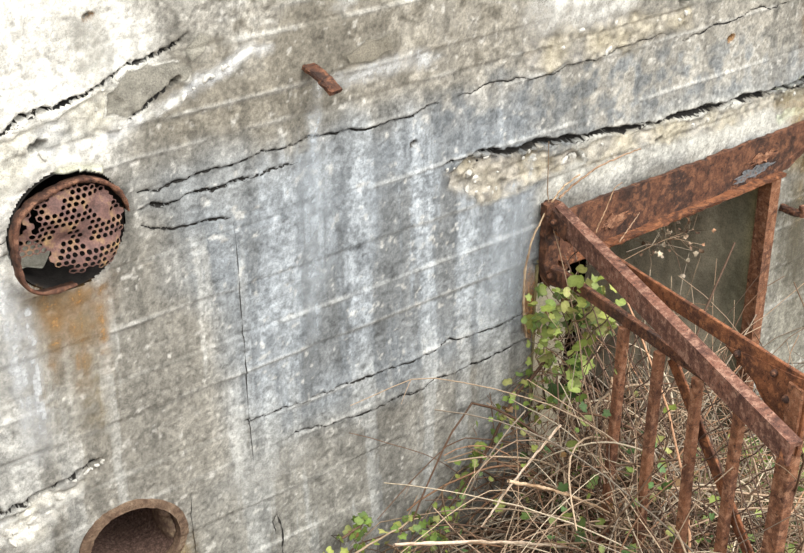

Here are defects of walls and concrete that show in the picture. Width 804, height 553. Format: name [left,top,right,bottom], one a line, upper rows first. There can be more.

crack [0,37,181,136]
crack [458,1,789,96]
crack [446,75,804,172]
spalling [448,87,804,204]
crack [137,105,527,471]
crack [0,459,105,517]